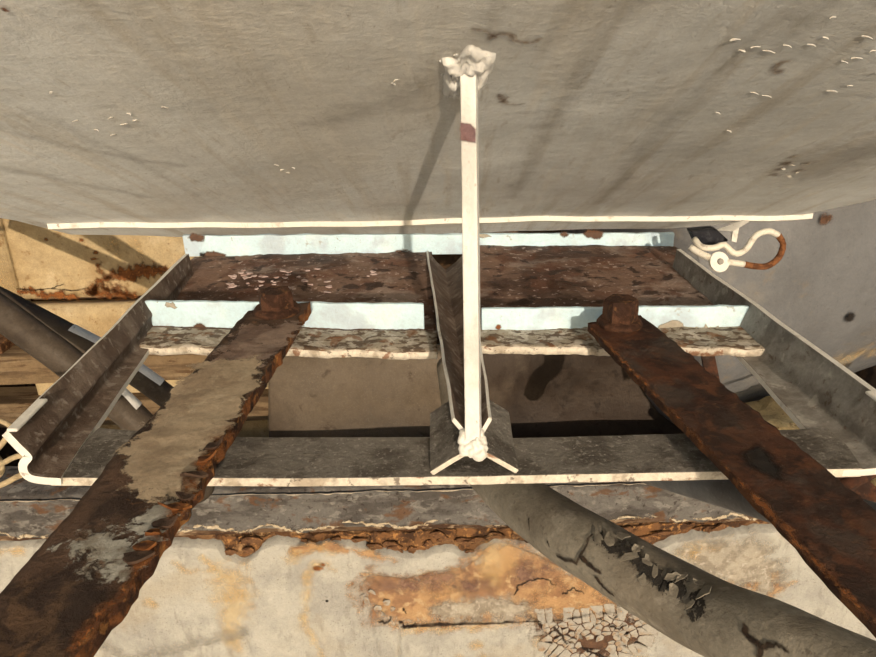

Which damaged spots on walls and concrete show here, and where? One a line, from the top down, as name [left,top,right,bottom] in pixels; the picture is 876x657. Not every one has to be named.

corrosion [17,251,168,301]
corrosion [0,286,311,657]
corrosion [587,294,876,638]
corrosion [289,541,616,629]
crack [547,534,614,596]